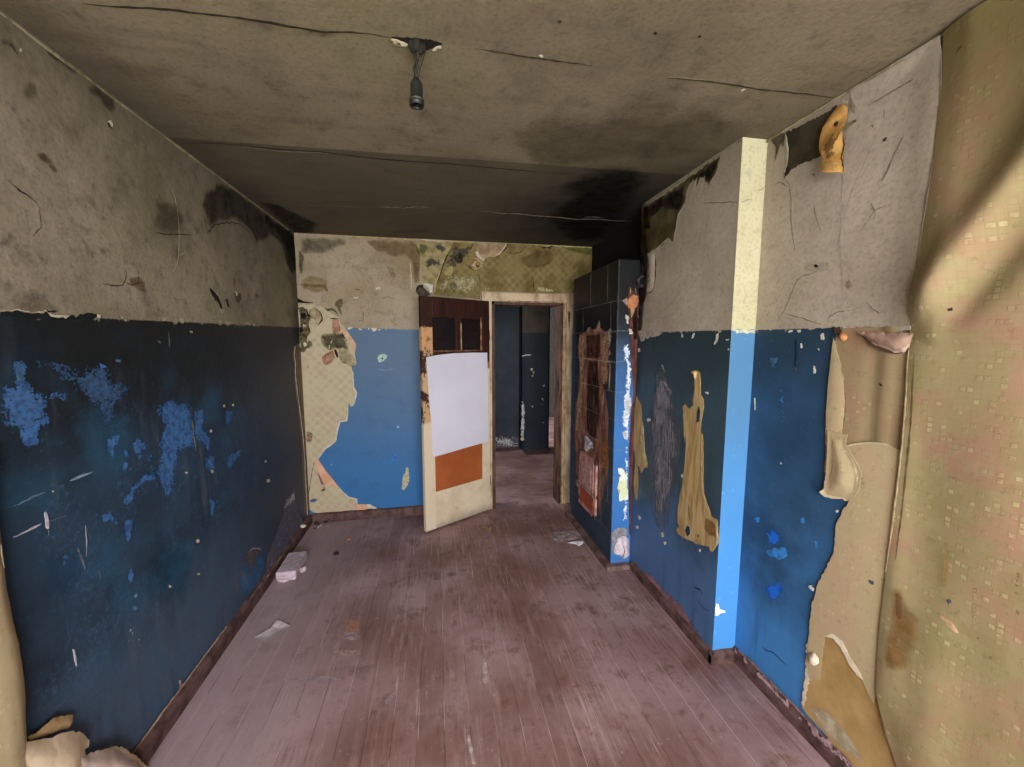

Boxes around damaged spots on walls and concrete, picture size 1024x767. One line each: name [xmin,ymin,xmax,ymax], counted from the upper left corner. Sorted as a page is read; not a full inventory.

crack [82,3,390,38]
crack [0,12,565,243]
crack [476,48,591,66]
crack [671,33,944,249]
peeling [771,104,856,178]
peeling [1,360,242,505]
leakage [203,186,340,291]
peeling [293,304,380,518]
leakage [370,239,453,294]
peeling [611,156,720,559]
crack [779,271,879,324]
peeling [806,430,900,703]